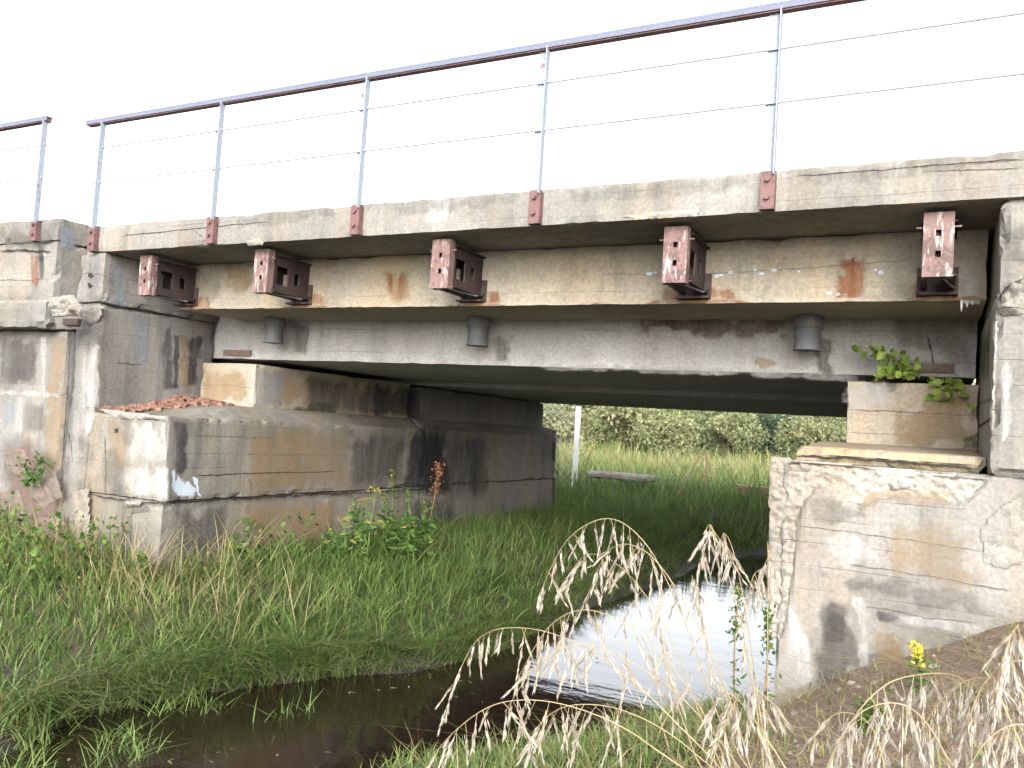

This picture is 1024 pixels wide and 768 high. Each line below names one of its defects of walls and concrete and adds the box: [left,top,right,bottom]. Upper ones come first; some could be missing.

corrosion [840,258,863,297]
leakage [163,330,296,404]
corrosion [658,319,782,337]
crack [93,435,423,538]
spalling [768,457,984,639]
leakage [790,597,867,684]